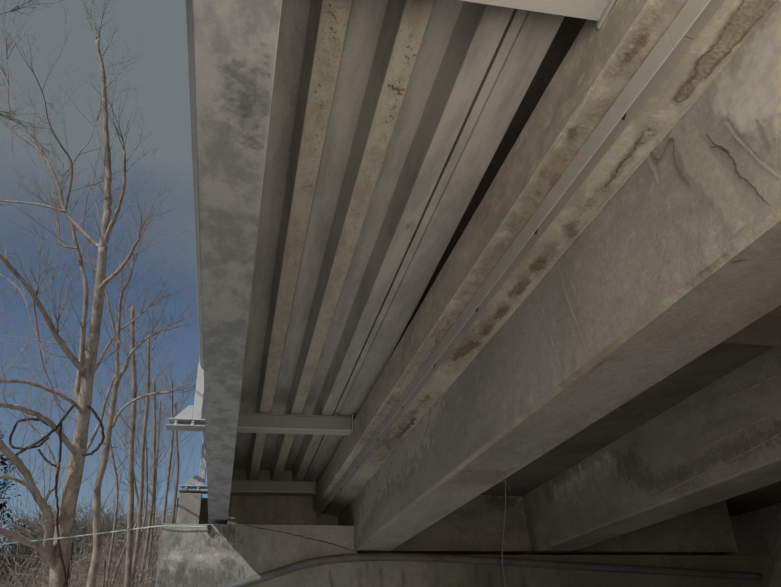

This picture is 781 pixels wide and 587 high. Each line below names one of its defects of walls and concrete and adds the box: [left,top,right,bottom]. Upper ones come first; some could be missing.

crack [707,134,769,205]